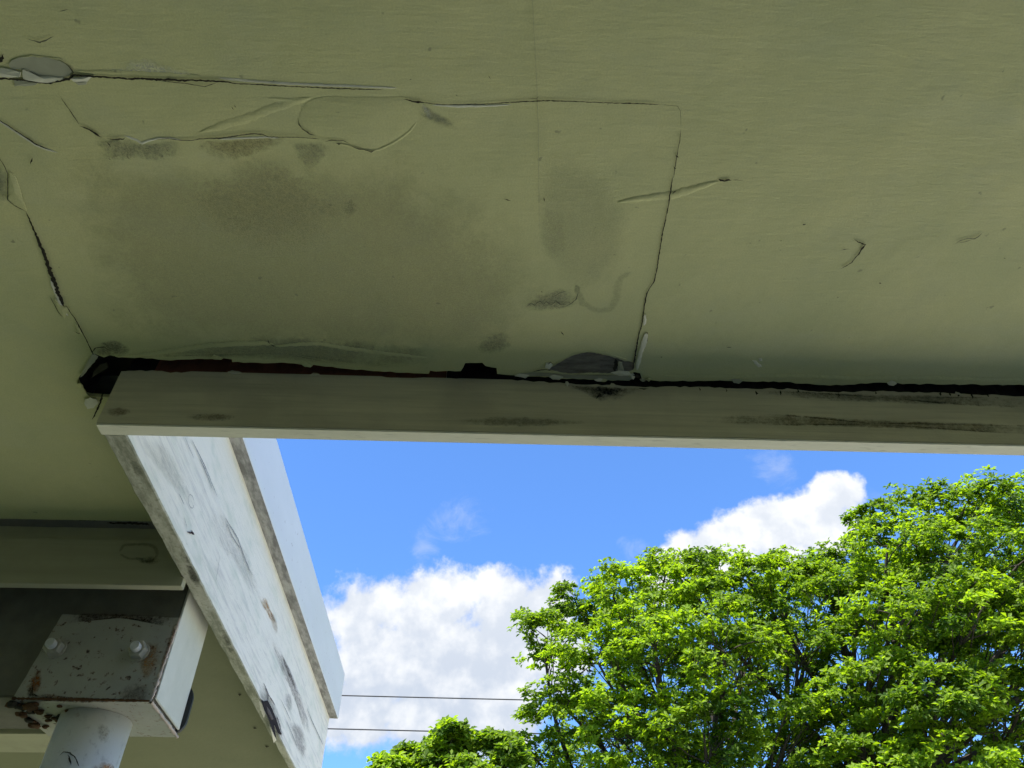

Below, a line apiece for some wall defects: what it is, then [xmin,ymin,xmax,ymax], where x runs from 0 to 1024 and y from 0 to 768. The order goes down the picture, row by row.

spalling [9,54,72,77]
crack [0,55,681,370]
rust [4,674,93,729]